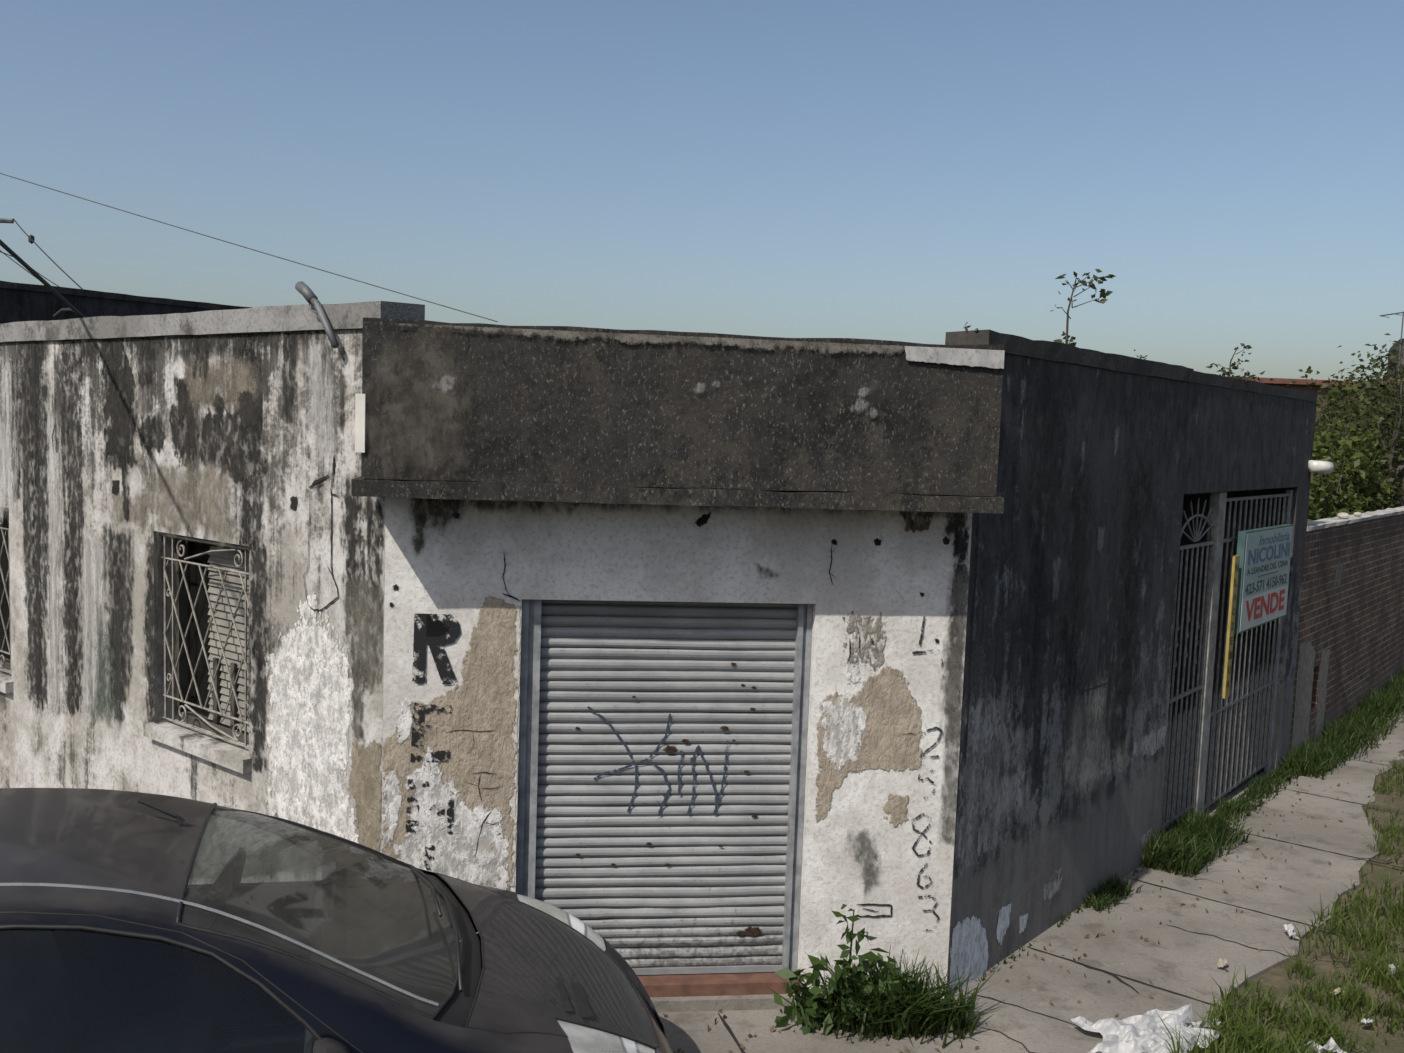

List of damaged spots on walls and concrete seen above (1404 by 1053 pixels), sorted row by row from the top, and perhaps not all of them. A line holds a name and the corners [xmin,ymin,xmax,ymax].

damp [10,331,325,772]
damp [340,479,384,739]
peeling [262,592,521,891]
peeling [815,611,923,827]